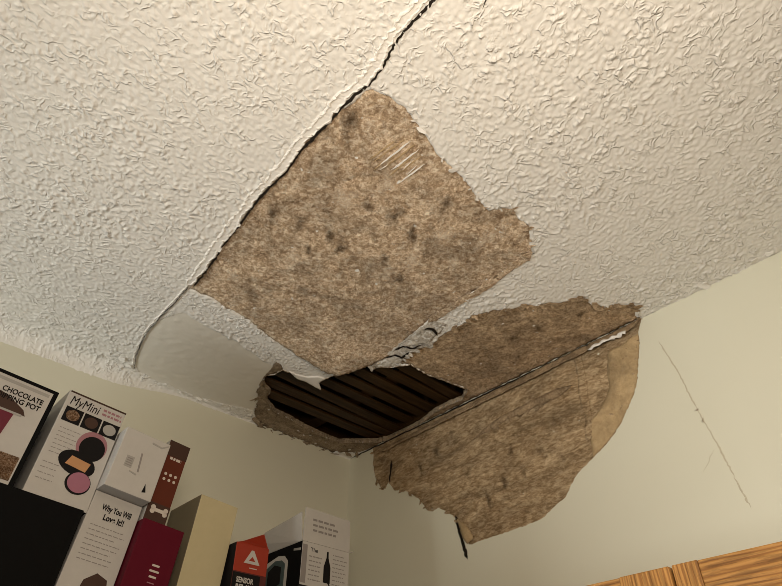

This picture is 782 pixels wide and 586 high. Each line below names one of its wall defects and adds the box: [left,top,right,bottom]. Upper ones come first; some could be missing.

crack [132,0,436,369]
peeling [114,89,643,544]
crack [659,342,751,507]